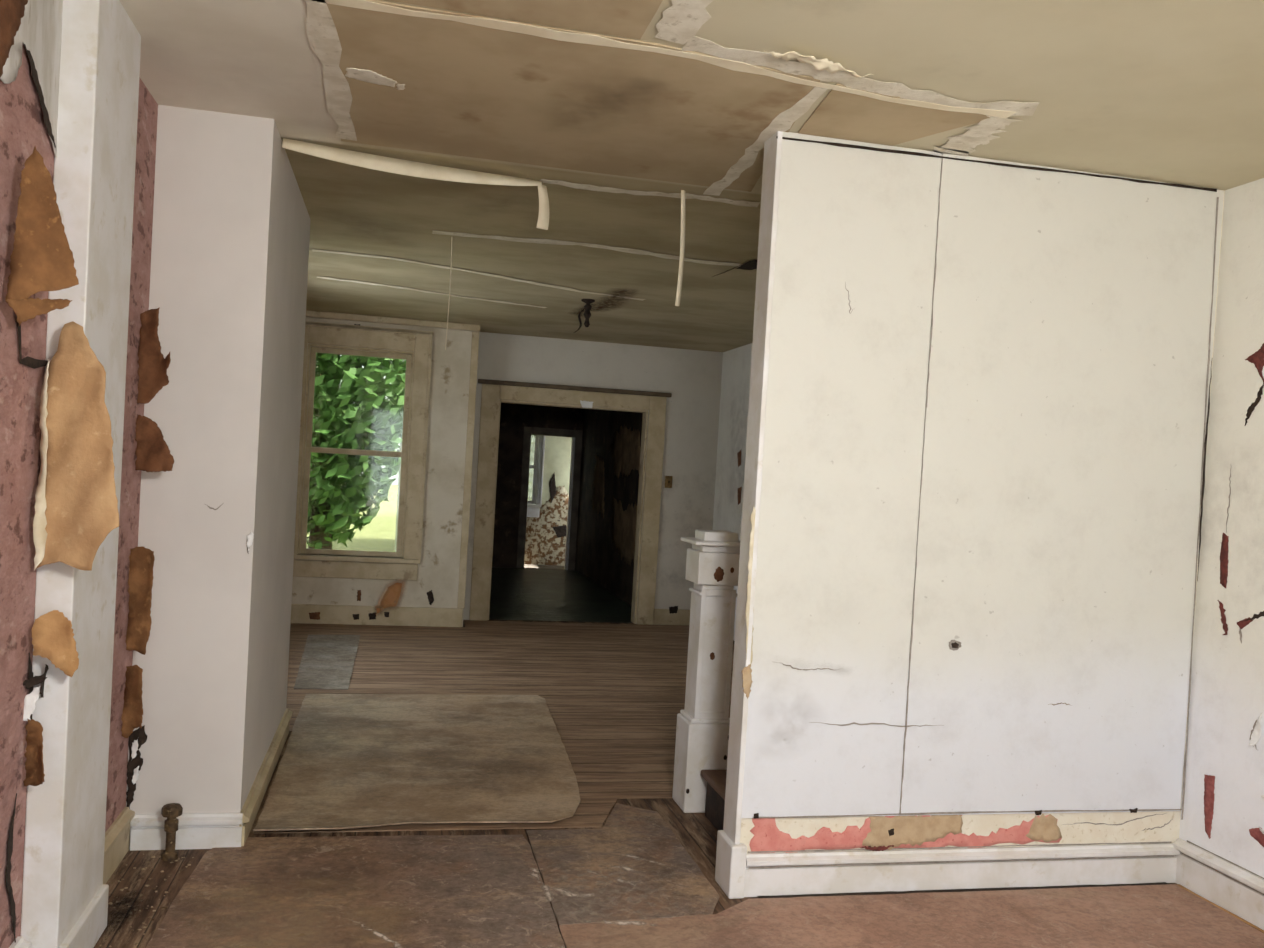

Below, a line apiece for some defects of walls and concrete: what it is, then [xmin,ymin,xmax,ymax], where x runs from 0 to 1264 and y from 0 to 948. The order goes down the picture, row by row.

peeling [764,51,874,78]
peeling [1244,343,1264,426]
peeling [1218,469,1264,643]
peeling [353,590,389,620]
peeling [23,664,49,721]
peeling [126,725,147,809]
peeling [749,813,1062,853]
peeling [1204,774,1215,839]
peeling [1249,826,1264,847]